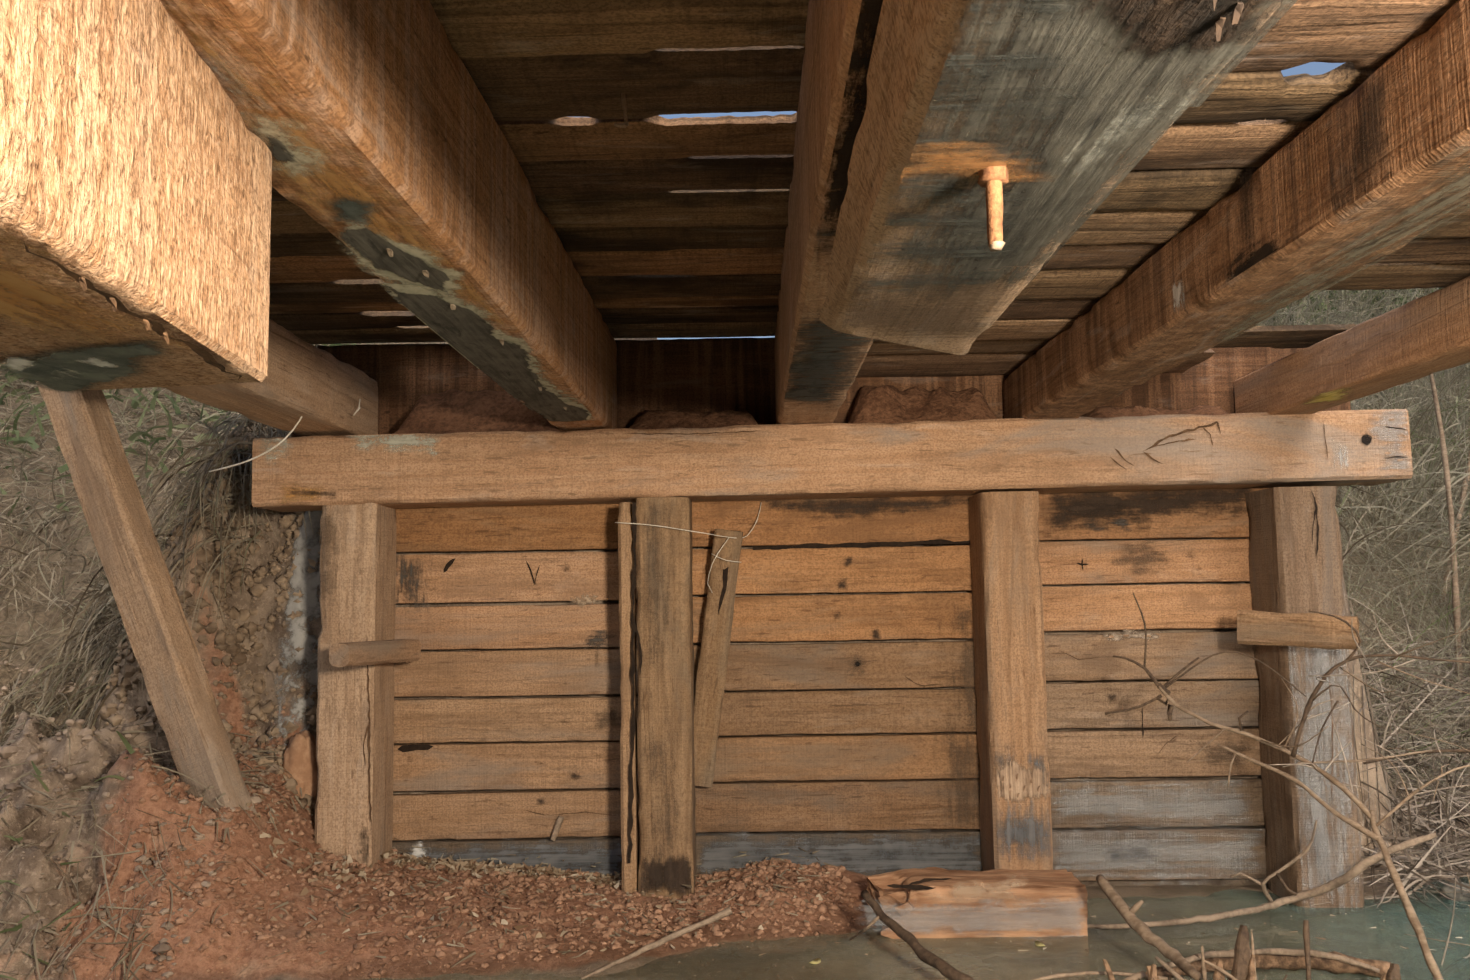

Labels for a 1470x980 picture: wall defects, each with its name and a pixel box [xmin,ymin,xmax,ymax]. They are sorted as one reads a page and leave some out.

rust [900,143,1032,181]
water stain [865,0,1297,296]
water stain [1330,77,1383,209]
water stain [0,341,163,392]
water stain [784,314,874,406]
crack [518,502,642,863]